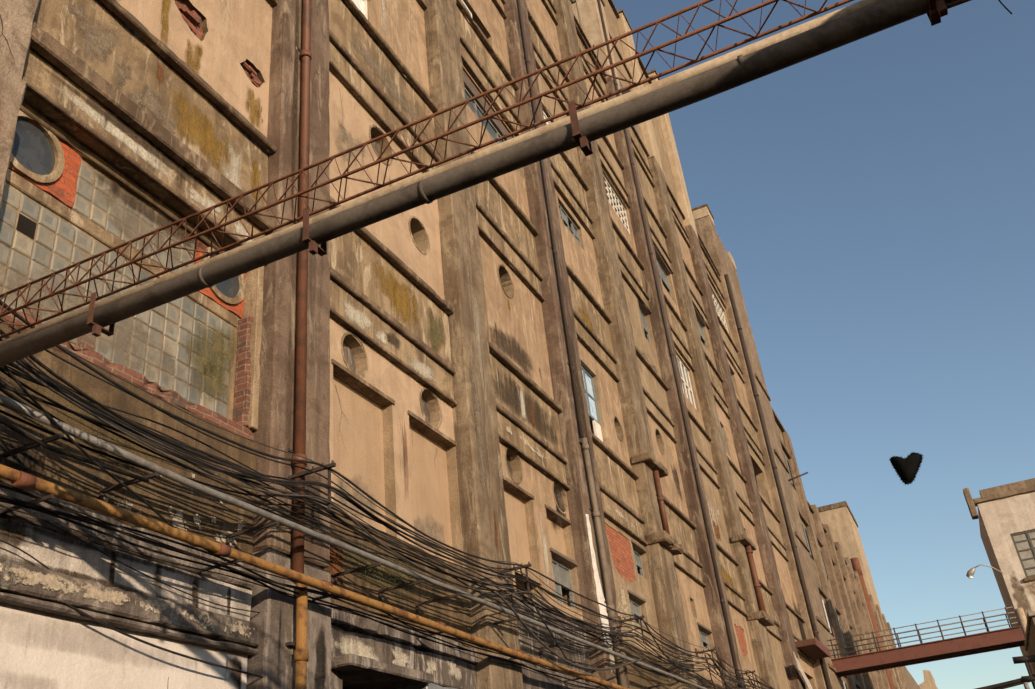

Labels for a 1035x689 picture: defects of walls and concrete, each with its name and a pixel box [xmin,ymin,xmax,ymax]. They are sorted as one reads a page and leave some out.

damp [162,0,171,40]
flaking render [174,0,203,39]
flaking render [240,61,262,87]
damp [375,263,444,353]
damp [187,329,234,396]
peeling [168,506,244,546]
peeling [0,563,168,615]
flaking render [605,504,636,635]
peeling [181,609,255,637]